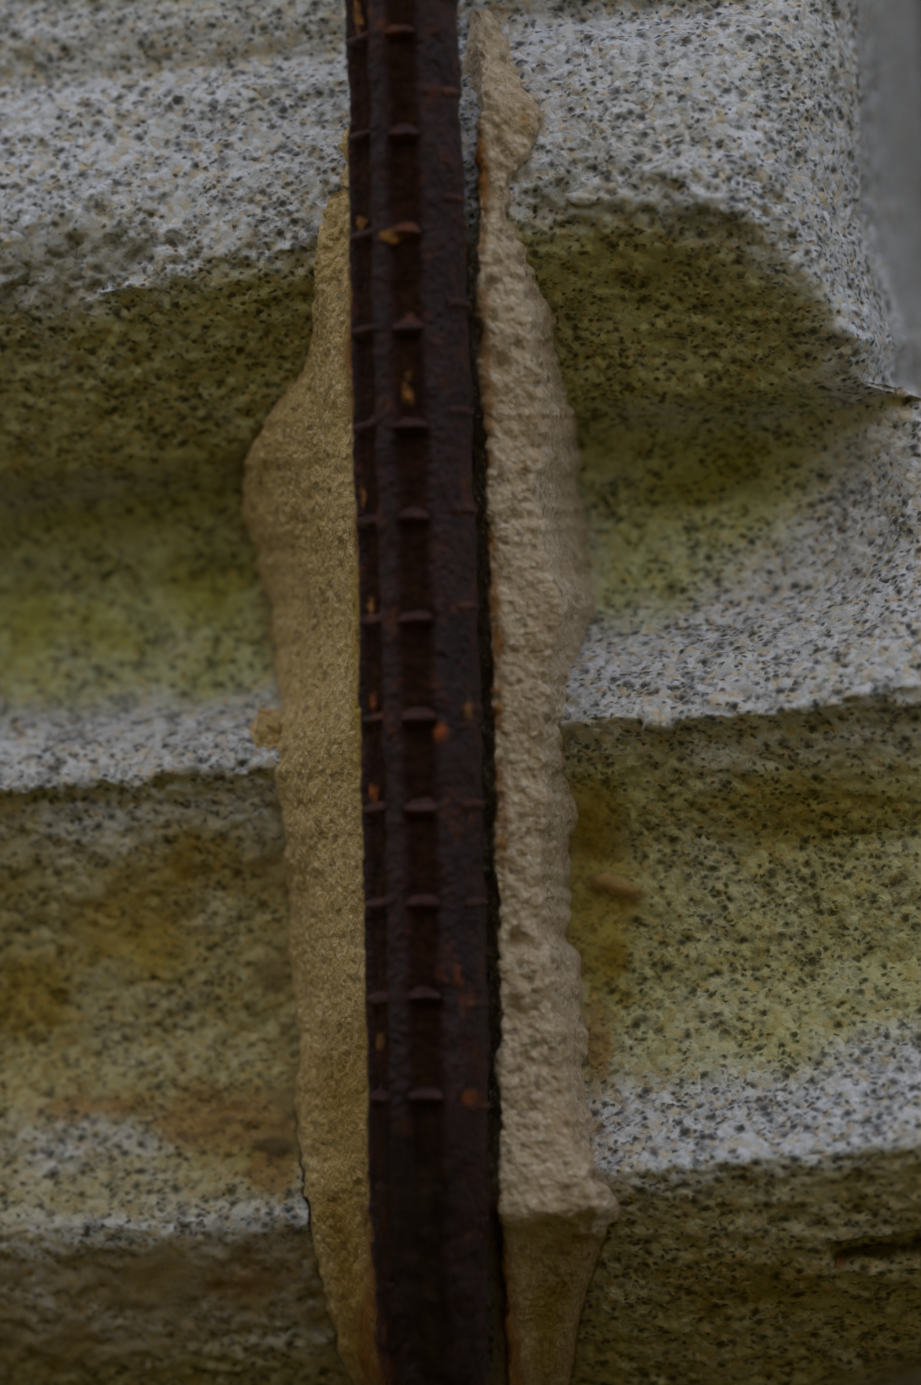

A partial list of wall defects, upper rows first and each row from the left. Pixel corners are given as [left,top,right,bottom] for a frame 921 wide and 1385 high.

rust [379,230,401,243]
rust [475,127,493,250]
rust [486,530,504,658]
rust [491,1189,525,1385]